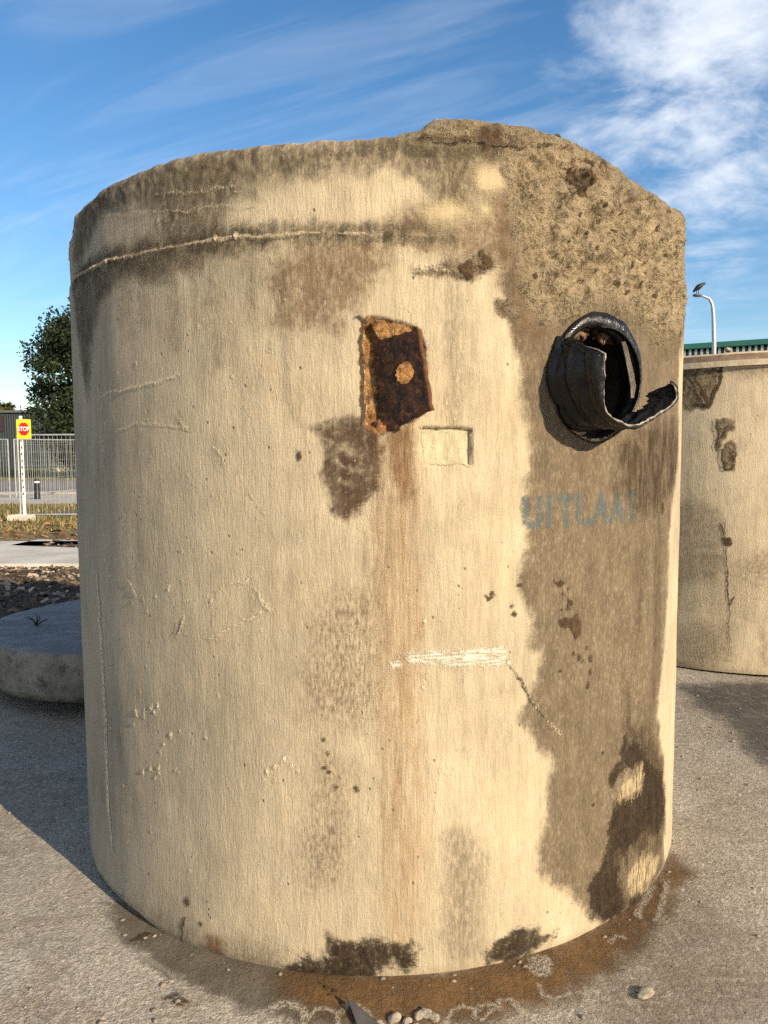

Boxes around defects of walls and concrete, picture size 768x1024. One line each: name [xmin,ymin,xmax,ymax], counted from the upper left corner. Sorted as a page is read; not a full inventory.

water stain [72,119,505,392]
corrosion [361,315,418,436]
spalling [714,417,737,471]
water stain [269,181,768,922]
crack [719,520,735,661]
crack [507,662,560,733]
water stain [106,900,419,1024]
water stain [450,834,557,976]